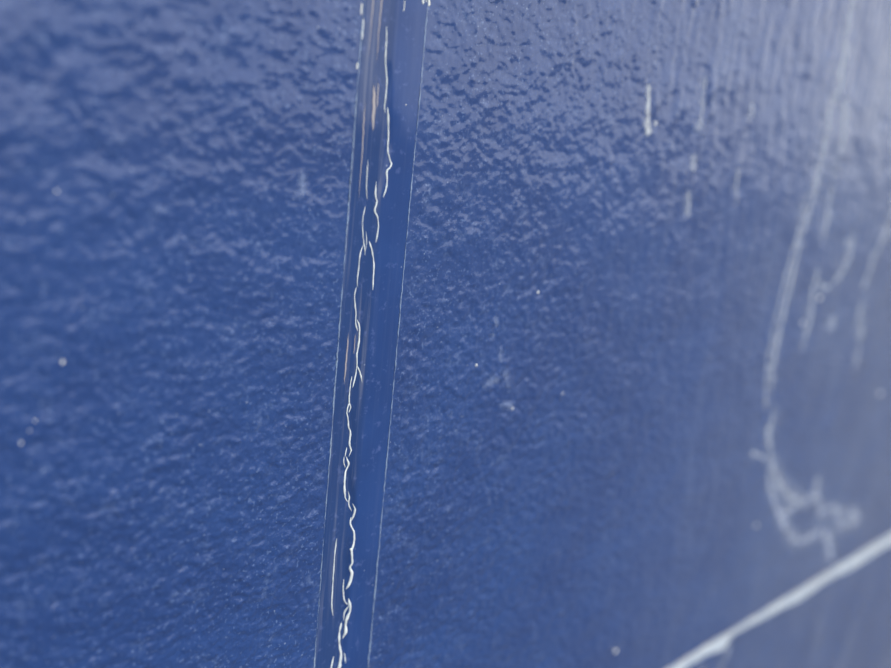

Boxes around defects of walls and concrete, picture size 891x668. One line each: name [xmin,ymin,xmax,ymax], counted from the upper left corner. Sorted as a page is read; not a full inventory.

crack [331,26,392,668]